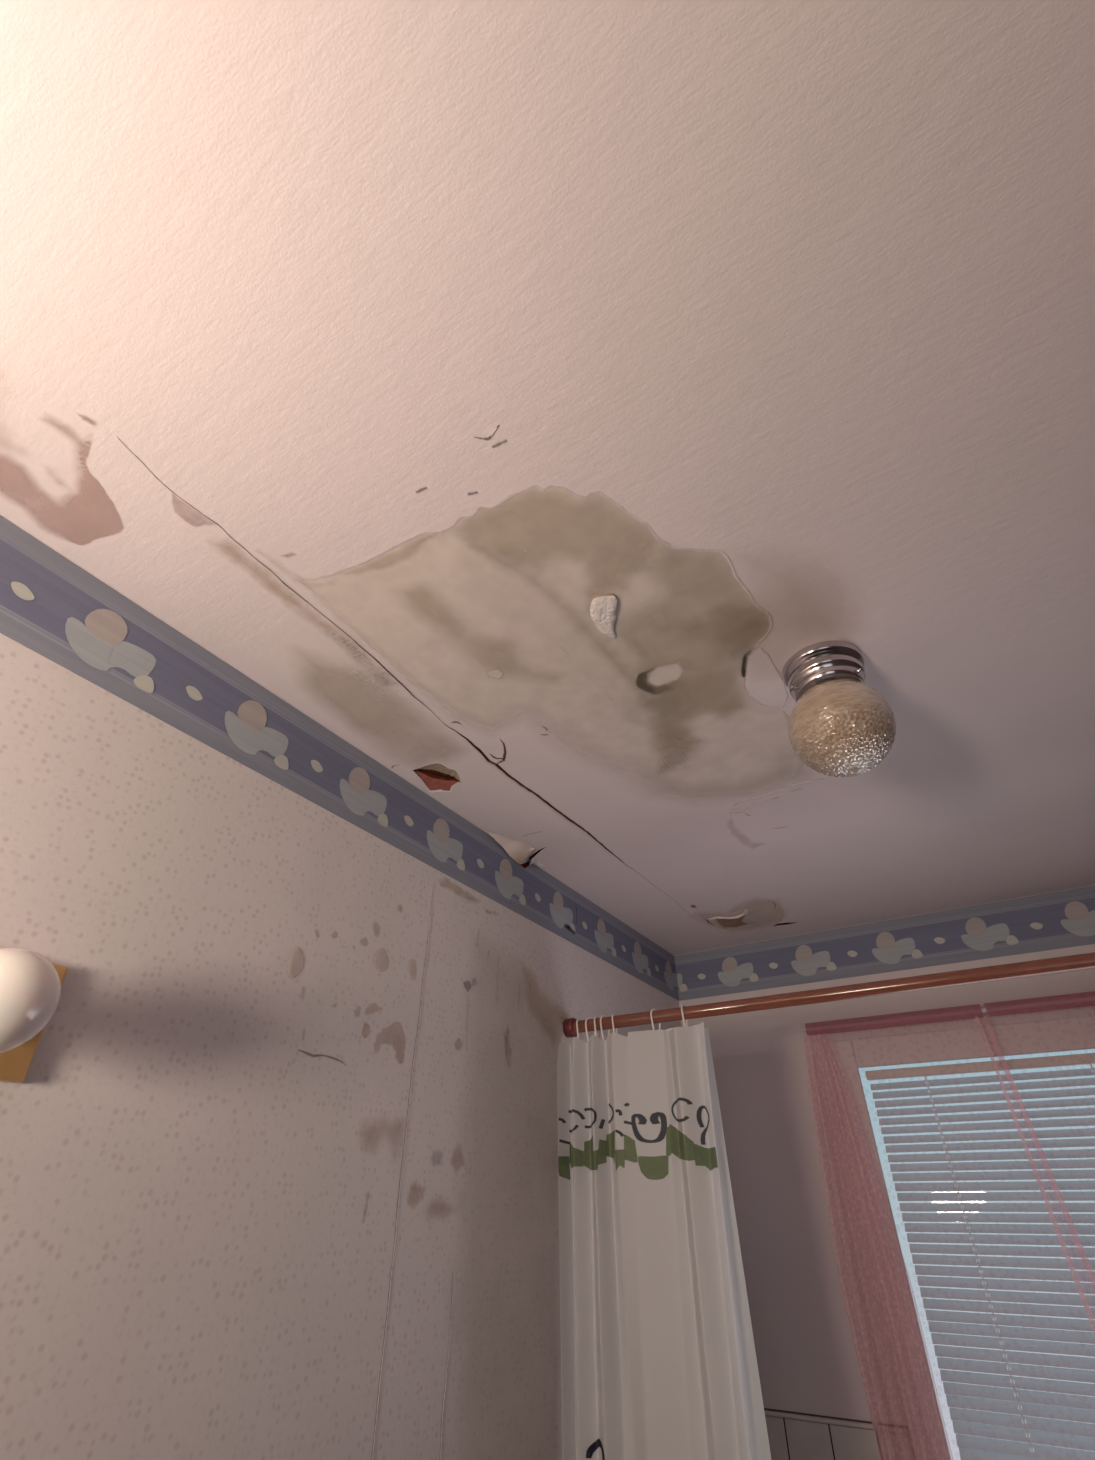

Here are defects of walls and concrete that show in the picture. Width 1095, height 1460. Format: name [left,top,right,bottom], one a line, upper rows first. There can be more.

crack [118,438,691,915]
peeling [284,485,797,794]
peeling [691,900,798,930]